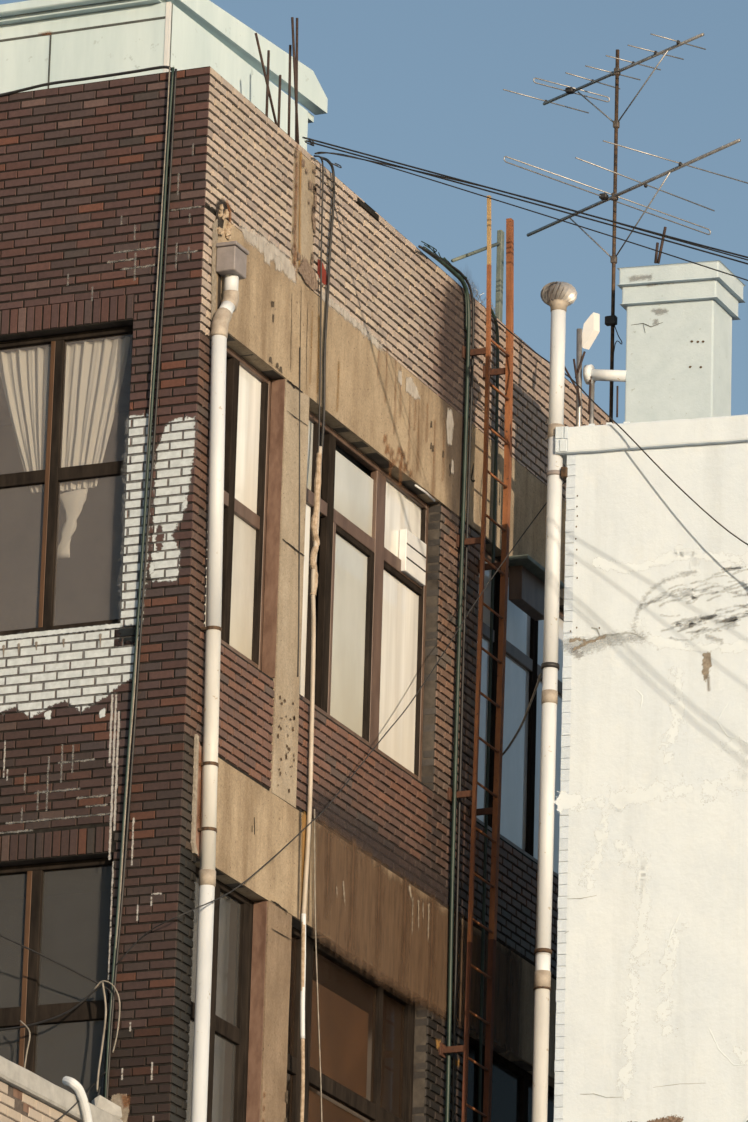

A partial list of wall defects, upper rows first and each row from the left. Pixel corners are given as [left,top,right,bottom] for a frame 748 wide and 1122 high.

peeling [0,414,197,720]
water stain [313,819,522,1059]